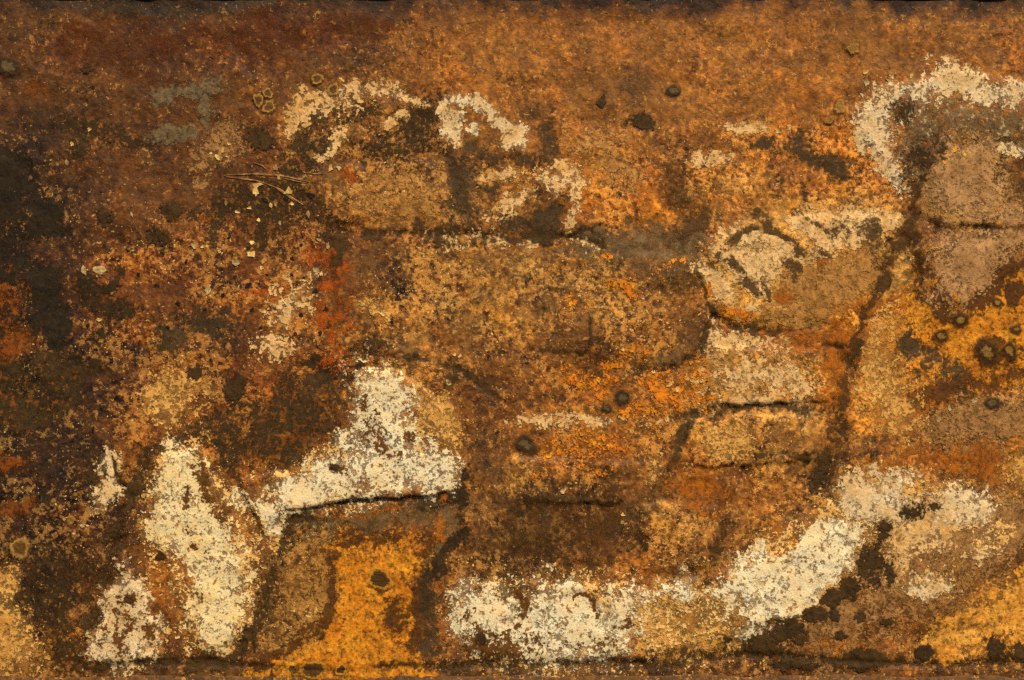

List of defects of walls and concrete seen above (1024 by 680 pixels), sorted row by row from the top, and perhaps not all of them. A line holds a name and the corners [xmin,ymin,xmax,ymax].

leakage [287,87,712,291]
leakage [713,204,883,303]
corrosion [700,243,1024,418]
leakage [884,91,1024,193]
leakage [74,440,111,506]
leakage [11,521,104,678]
corrosion [96,591,162,658]
crack [73,450,440,677]
corrosion [242,502,446,680]
crack [366,635,1024,676]
corrosion [742,500,942,673]
corrosion [914,562,1024,675]